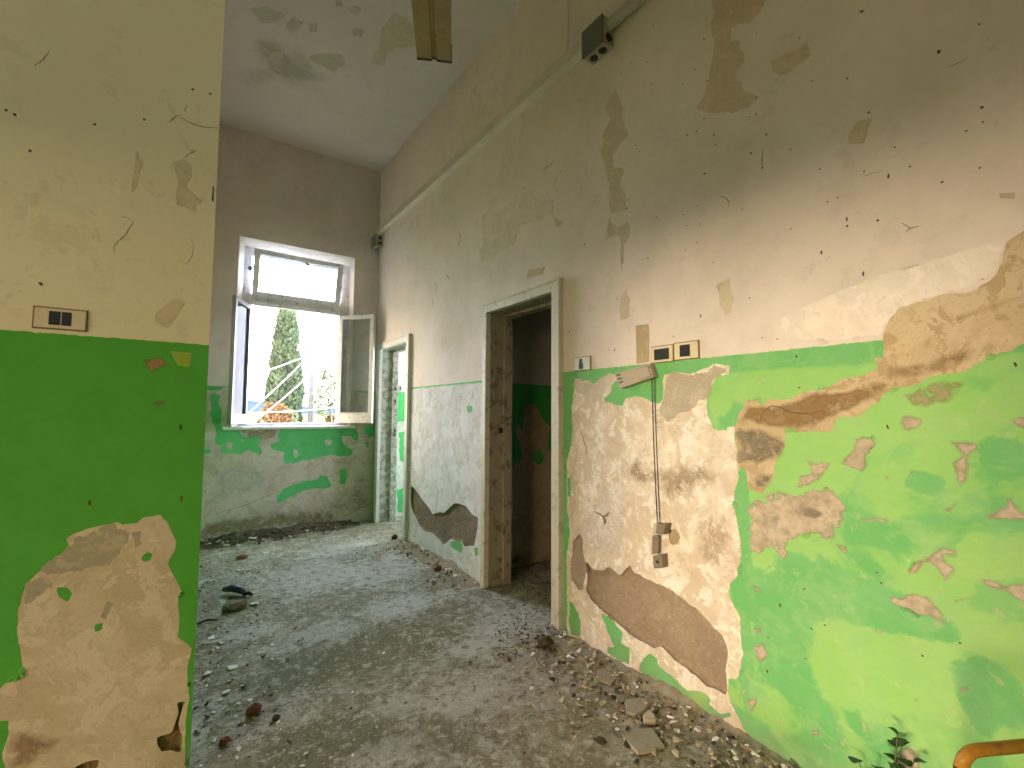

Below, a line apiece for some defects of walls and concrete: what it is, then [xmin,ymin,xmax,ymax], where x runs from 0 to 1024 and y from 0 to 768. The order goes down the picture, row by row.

peeling [687,0,765,136]
peeling [170,160,214,212]
peeling [600,89,640,264]
peeling [200,387,375,546]
peeling [395,383,482,583]
peeling [566,231,1024,733]
peeling [0,515,192,768]